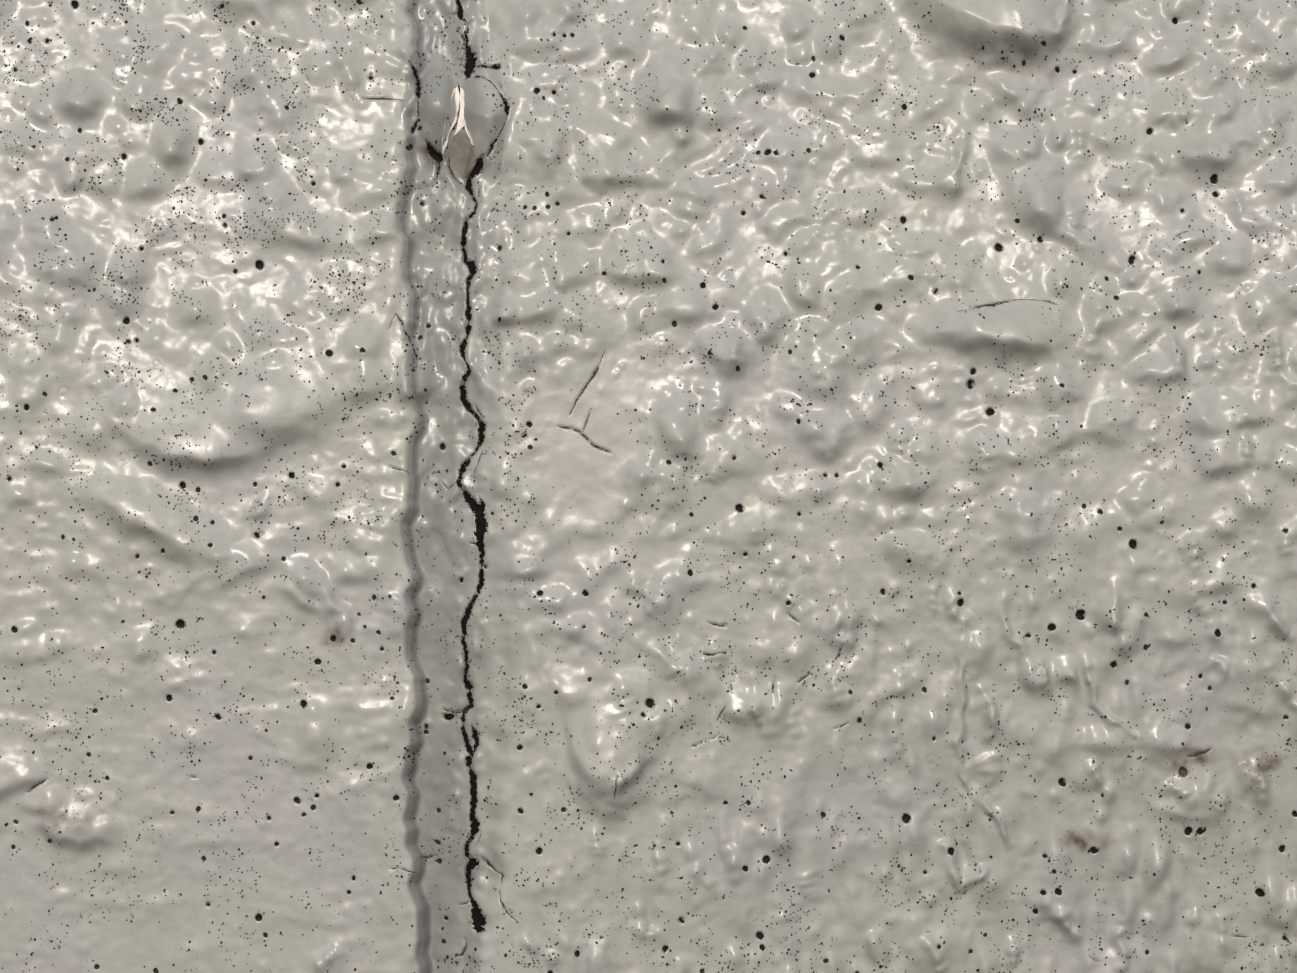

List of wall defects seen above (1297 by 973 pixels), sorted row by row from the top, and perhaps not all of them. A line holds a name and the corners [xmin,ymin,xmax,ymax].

crack [364,0,517,973]